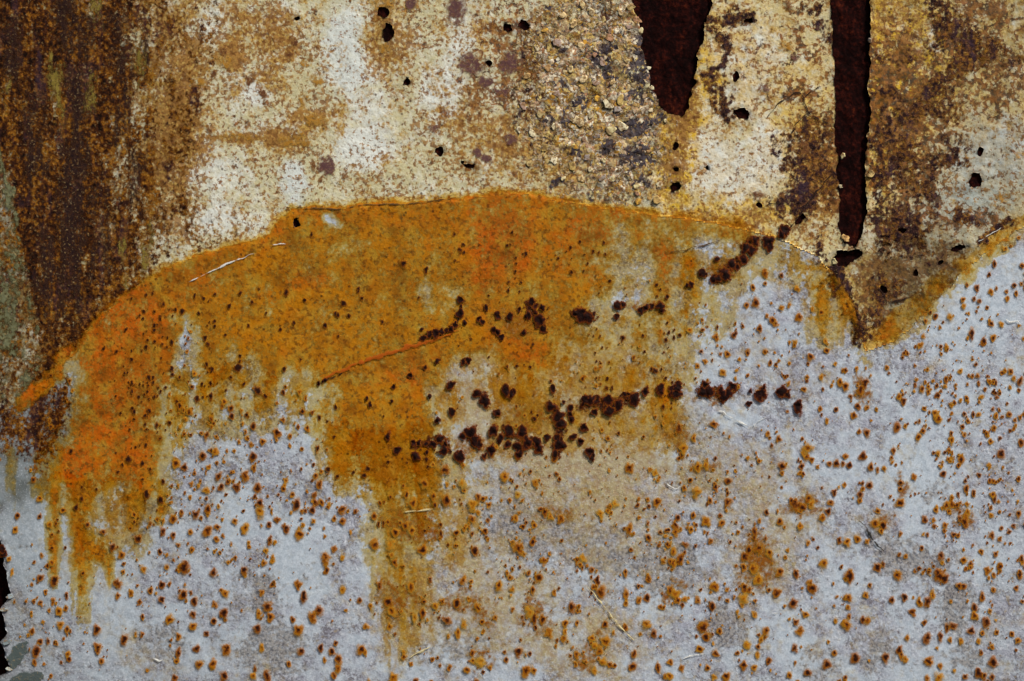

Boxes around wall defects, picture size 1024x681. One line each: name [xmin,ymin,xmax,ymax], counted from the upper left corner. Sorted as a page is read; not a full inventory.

rust [811,0,1024,357]
rust [741,268,768,309]
rust [753,293,793,342]
rust [745,333,809,417]
rust [819,362,878,438]
rust [741,428,853,498]
rust [885,264,1024,656]
rust [223,467,338,534]
rust [206,530,280,594]
rust [584,481,873,674]
rust [13,578,72,652]
rust [663,650,684,680]